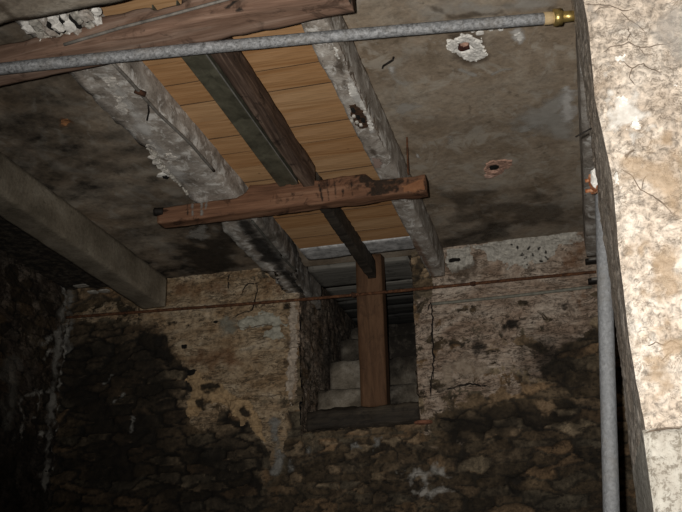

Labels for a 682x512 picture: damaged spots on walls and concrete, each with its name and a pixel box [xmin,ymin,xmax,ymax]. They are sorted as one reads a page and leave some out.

spalling [21,7,102,41]
spalling [446,28,503,63]
spalling [348,78,374,132]
crack [428,302,489,398]